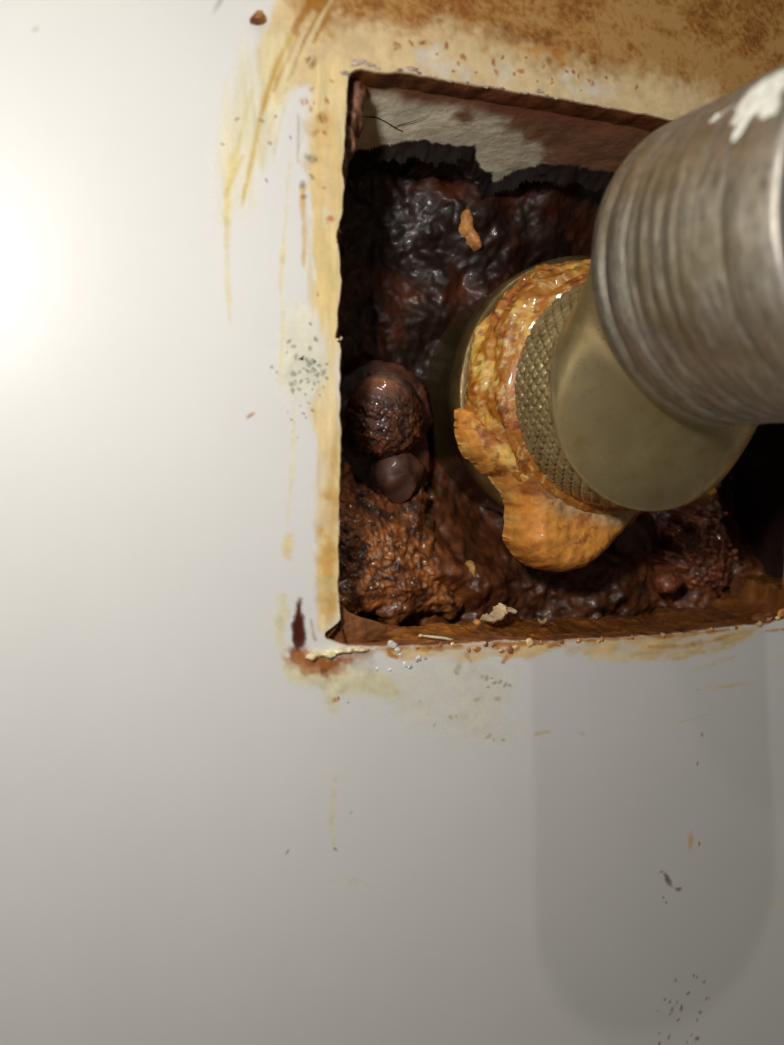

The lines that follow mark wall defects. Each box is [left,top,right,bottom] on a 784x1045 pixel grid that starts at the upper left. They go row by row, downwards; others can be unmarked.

rust [205,0,784,716]
peeling [305,647,369,661]
peeling [376,640,427,671]